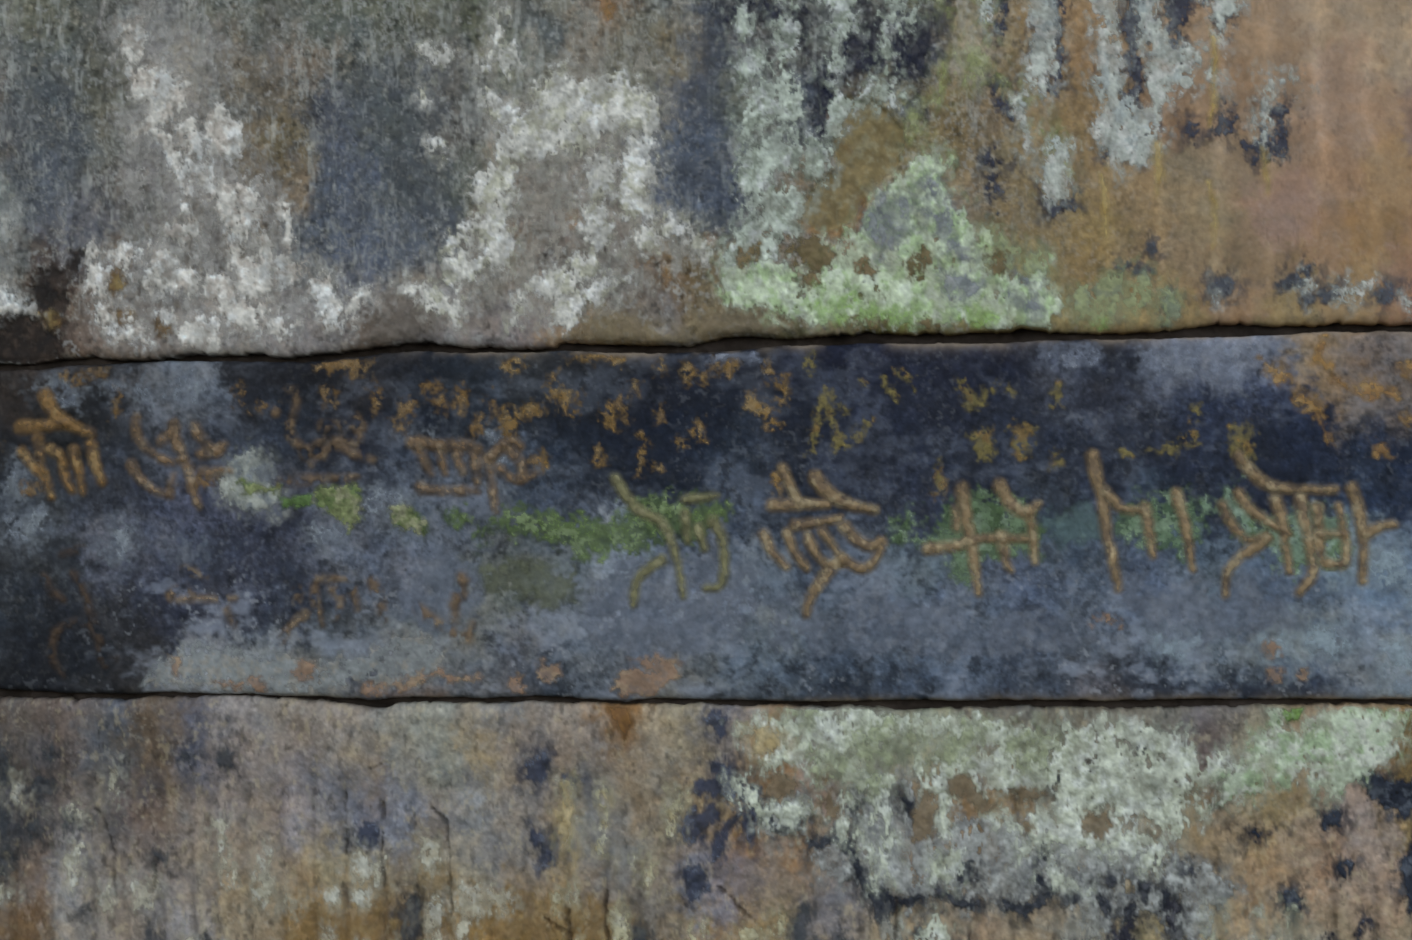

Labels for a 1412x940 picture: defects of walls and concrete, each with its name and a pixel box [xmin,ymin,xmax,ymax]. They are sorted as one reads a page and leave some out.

damp [723,0,812,48]
damp [812,0,955,142]
damp [83,15,376,353]
damp [398,7,715,331]
damp [0,199,24,243]
damp [0,285,36,315]
damp [219,447,281,510]
damp [3,505,55,541]
damp [143,630,444,694]
damp [555,781,573,852]